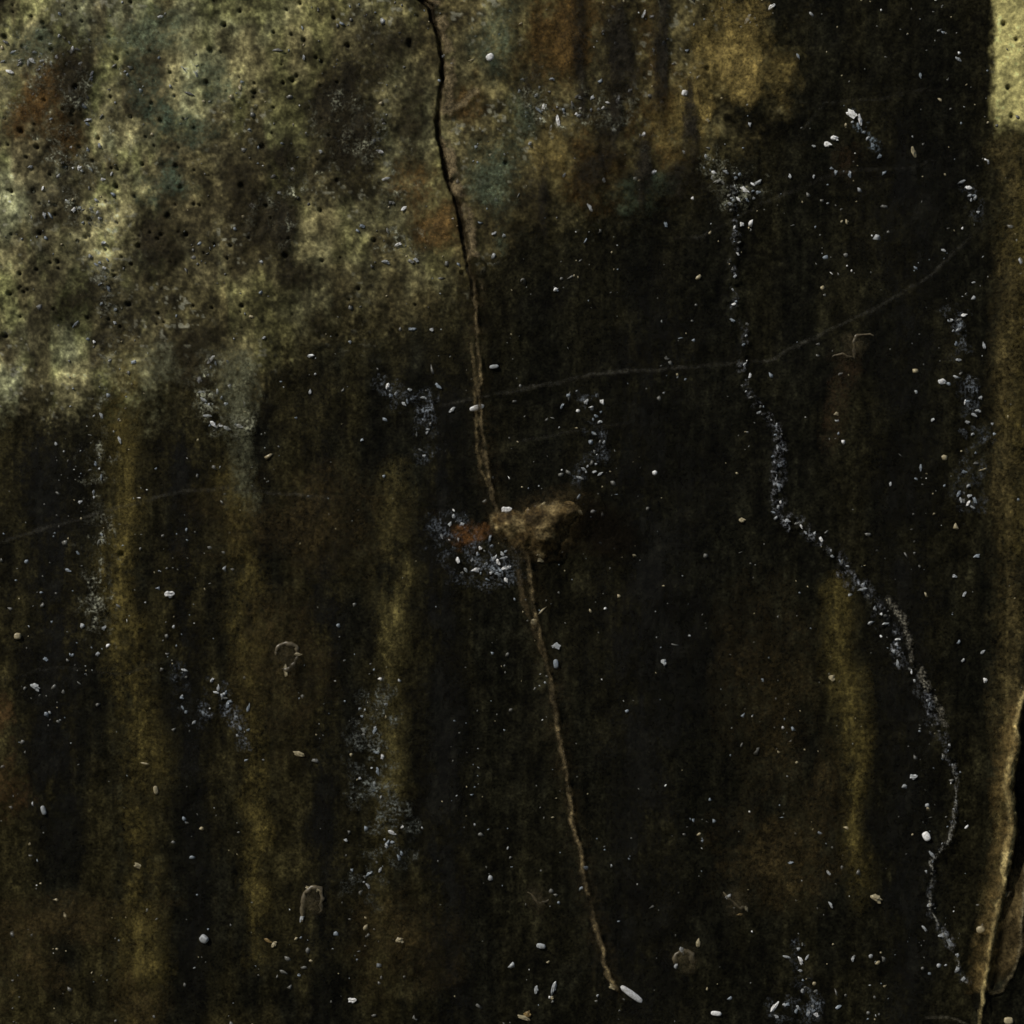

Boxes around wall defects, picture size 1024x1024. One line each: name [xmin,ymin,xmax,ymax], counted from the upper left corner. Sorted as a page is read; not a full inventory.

water stain [0,34,118,181]
water stain [304,11,423,195]
water stain [524,104,565,132]
water stain [571,0,637,147]
water stain [642,0,670,126]
water stain [65,198,179,282]
water stain [227,135,322,288]
water stain [374,227,406,264]
crack [419,0,501,515]
crack [518,547,618,990]